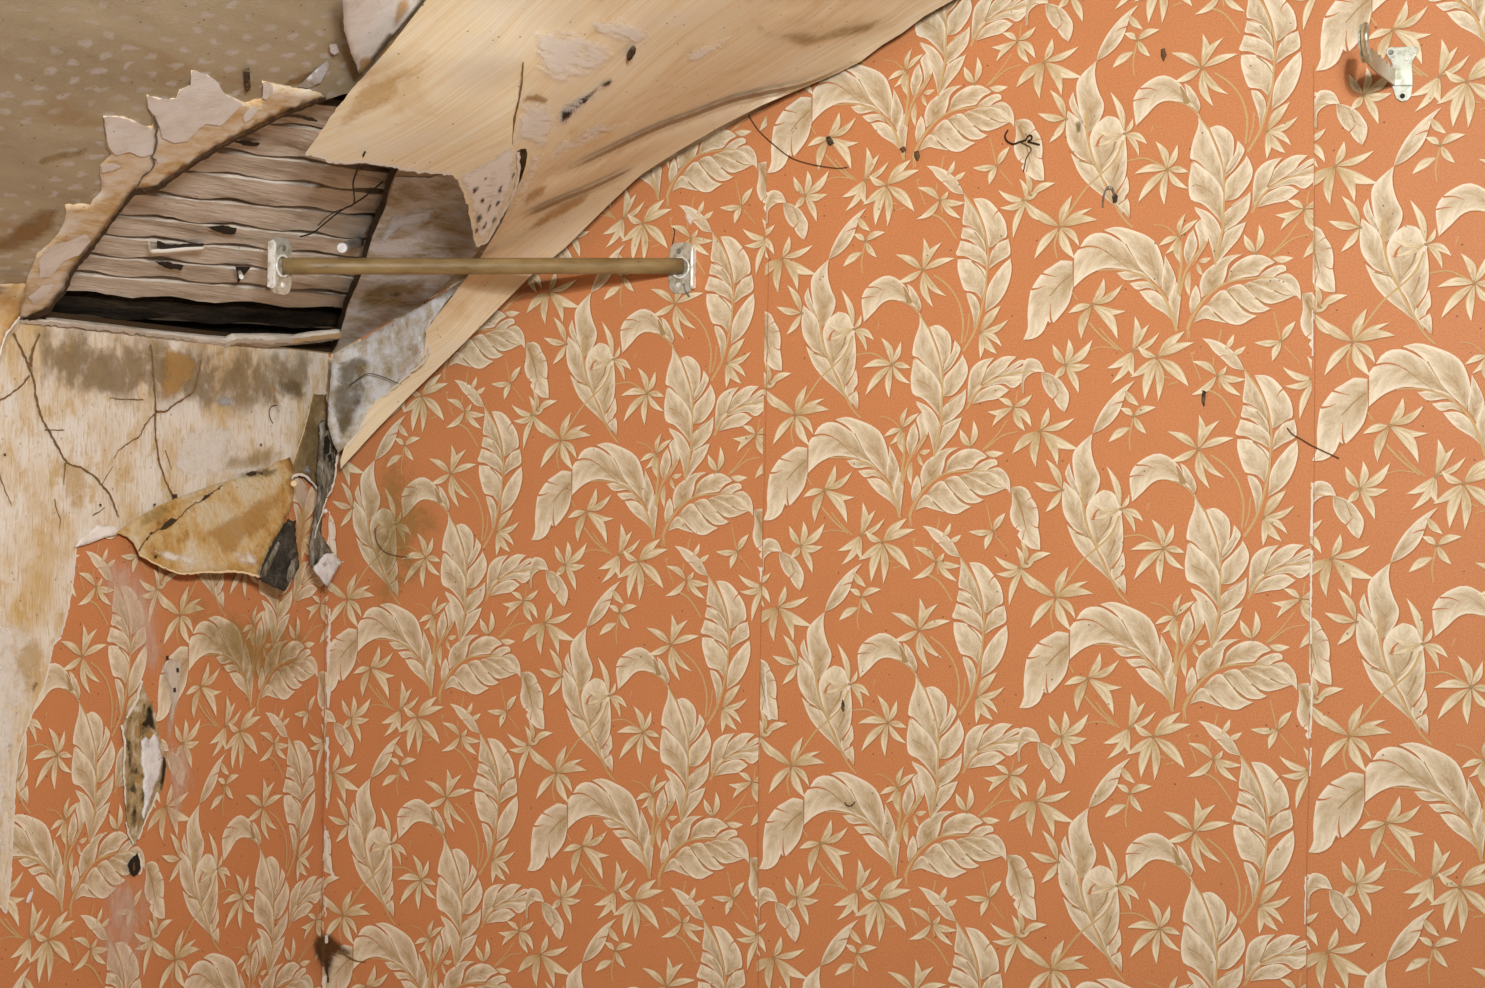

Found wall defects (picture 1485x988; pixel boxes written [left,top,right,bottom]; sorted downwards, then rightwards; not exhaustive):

crack [0,97,326,529]
water stain [163,353,194,397]
flaking render [156,225,237,270]
water stain [270,381,301,396]
water stain [309,420,342,586]
peeling [0,283,329,914]